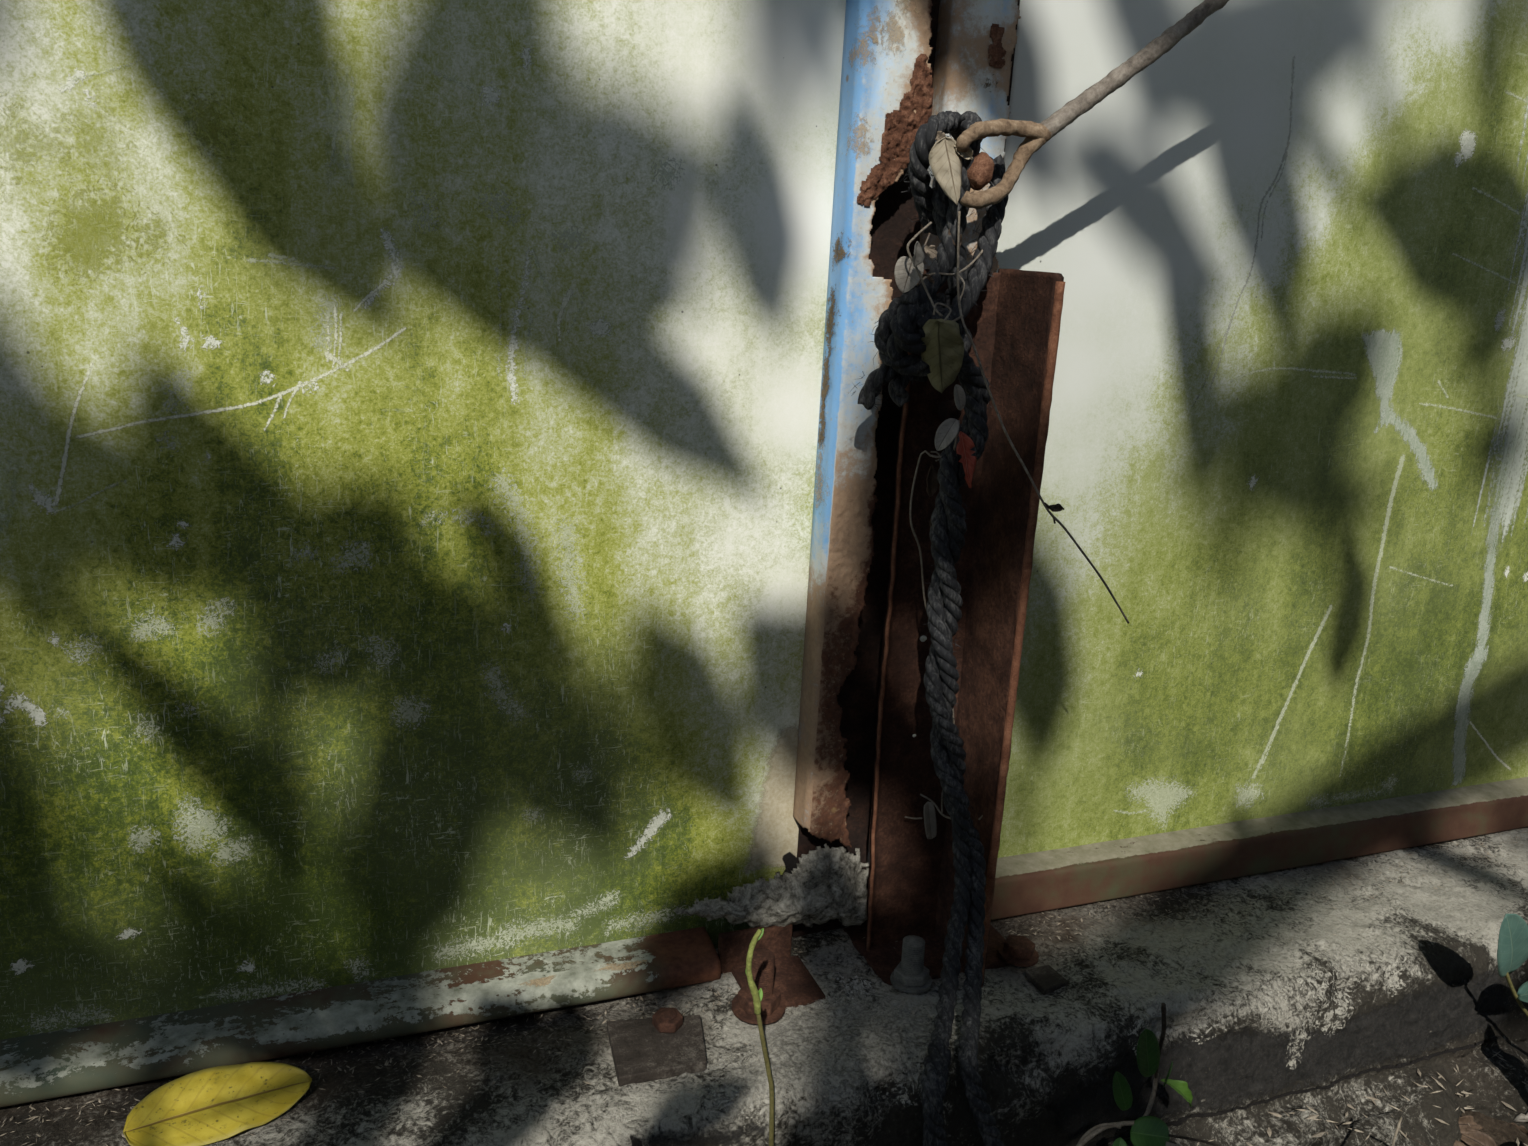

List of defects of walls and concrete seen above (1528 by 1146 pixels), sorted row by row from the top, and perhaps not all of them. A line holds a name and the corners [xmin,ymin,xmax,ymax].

rust [846,0,934,206]
rust [980,23,1006,88]
rust [815,236,852,508]
leakage [1451,100,1528,786]
leakage [1339,329,1437,777]
leakage [745,726,799,873]
peeling [9,958,35,975]
peeling [216,961,326,1006]
peeling [432,914,582,963]
peeling [605,905,693,935]
leakage [690,972,936,1127]
leakage [1044,941,1511,1142]